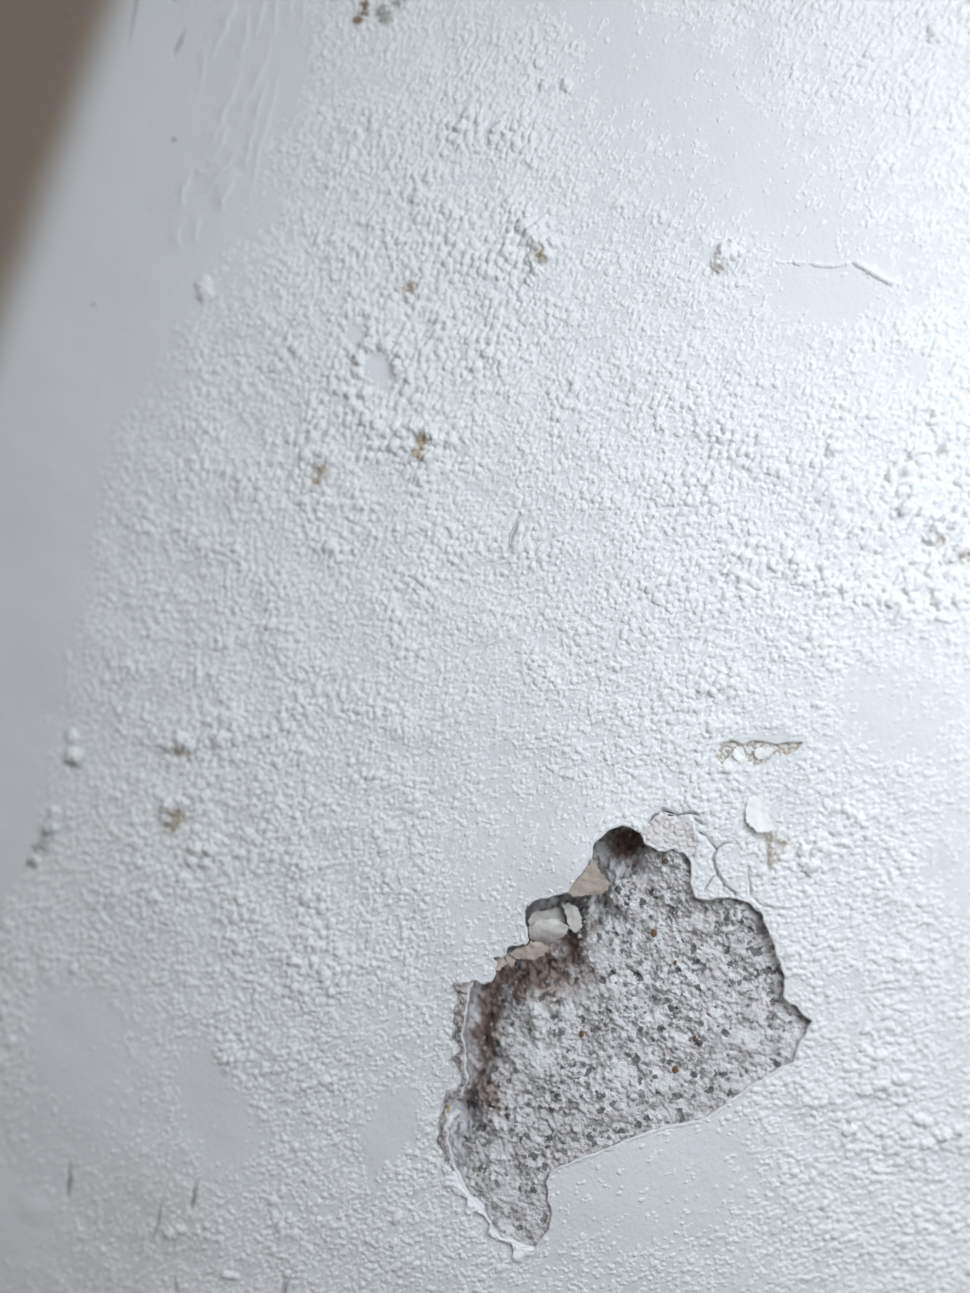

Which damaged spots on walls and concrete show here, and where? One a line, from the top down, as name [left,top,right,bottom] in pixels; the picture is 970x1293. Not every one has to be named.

spalling [437,811,815,1264]